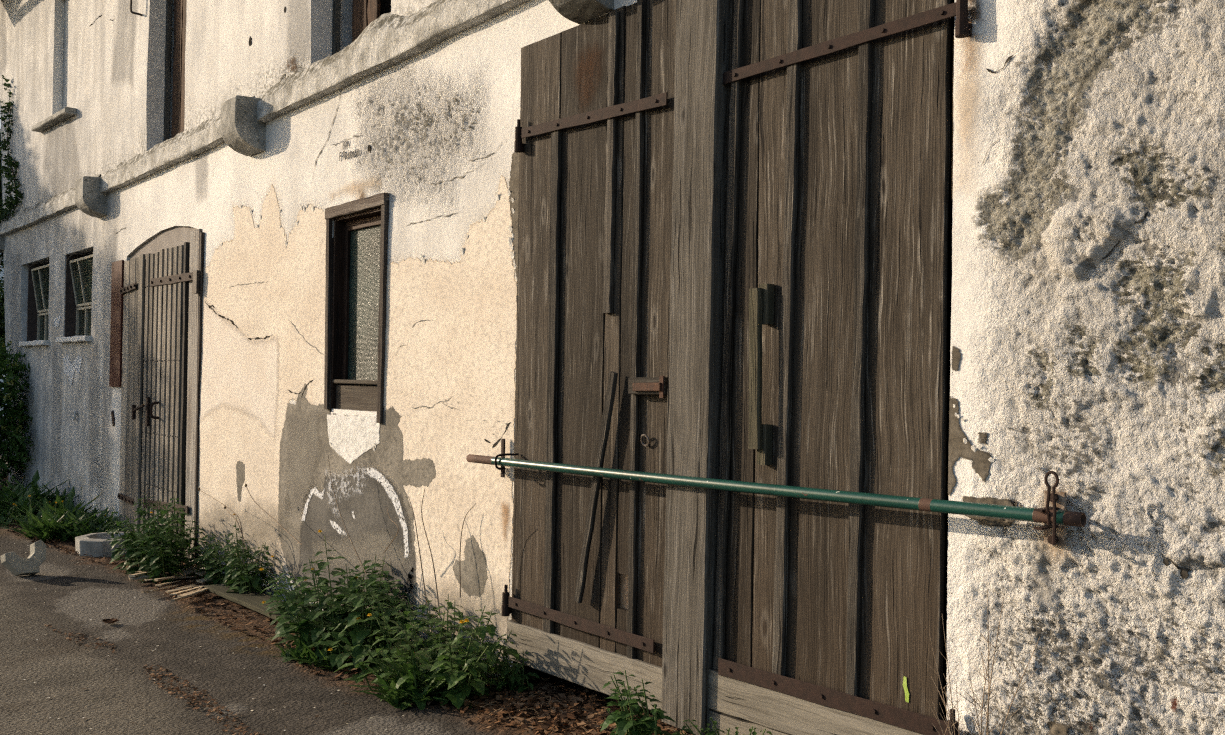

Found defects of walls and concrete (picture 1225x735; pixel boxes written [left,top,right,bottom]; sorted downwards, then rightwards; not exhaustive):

rust [965,0,980,66]
crack [312,91,360,180]
crack [429,142,502,185]
peeling [198,185,326,574]
crack [205,282,322,400]
peeling [384,175,517,677]
spalling [952,346,961,371]
spalling [948,396,1022,527]
peeling [1007,386,1140,531]
peeling [997,603,1225,735]